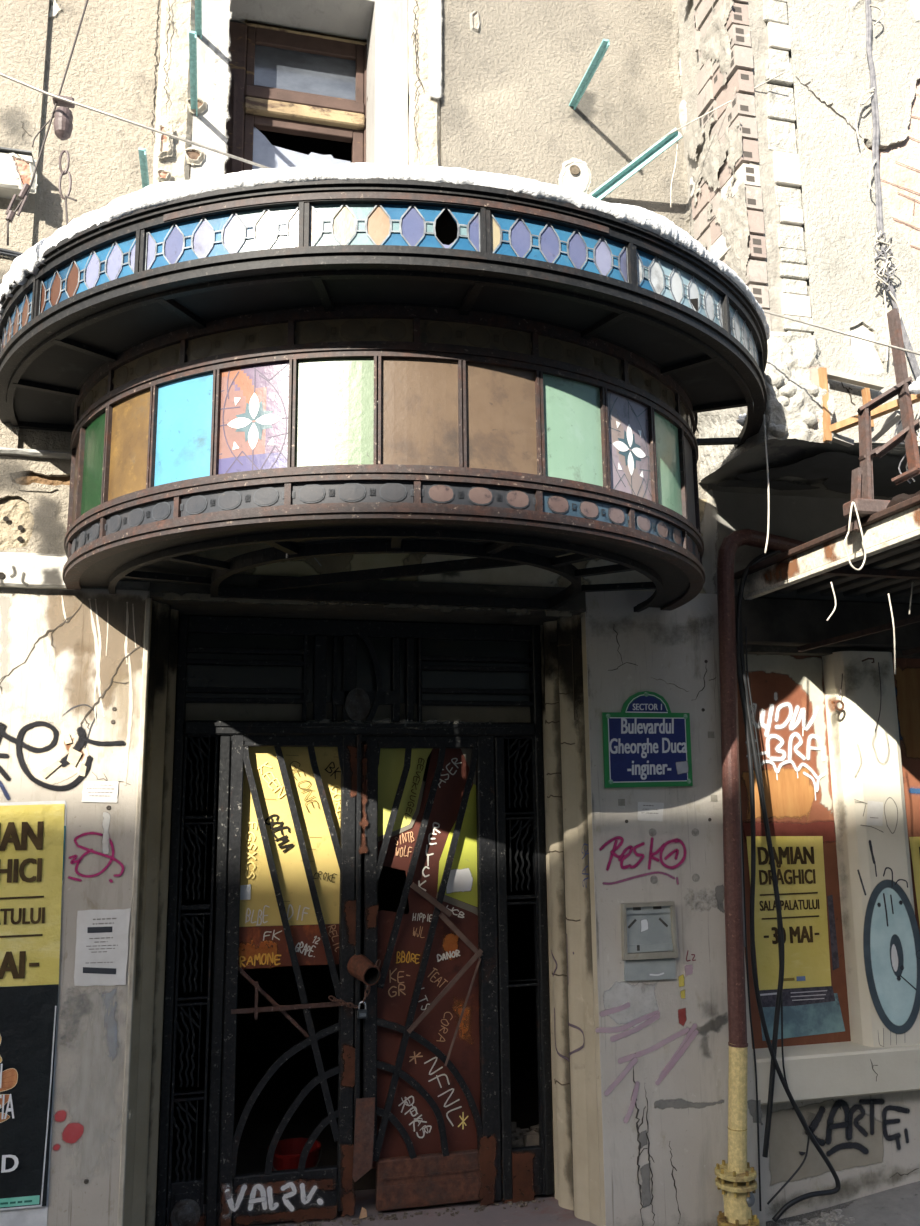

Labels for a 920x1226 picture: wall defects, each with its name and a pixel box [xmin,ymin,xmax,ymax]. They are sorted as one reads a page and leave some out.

crack [411,0,423,157]
flaking render [864,79,920,268]
flaking render [670,0,835,594]
rust [763,556,799,584]
rust [824,543,837,562]
crack [0,602,140,731]
water stain [0,497,151,993]
crack [631,1053,681,1226]